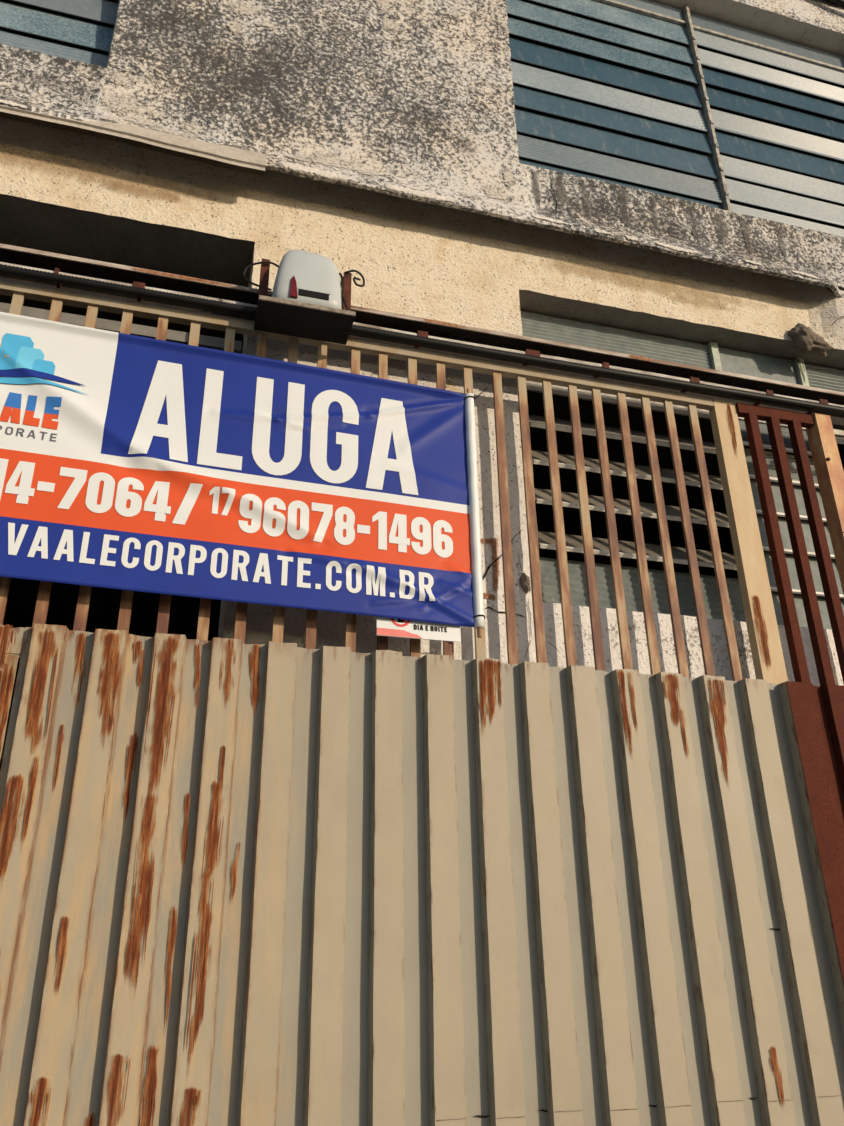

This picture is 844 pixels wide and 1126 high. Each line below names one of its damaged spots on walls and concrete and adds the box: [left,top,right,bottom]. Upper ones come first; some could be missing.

damp [278,161,357,182]
damp [382,184,461,203]
damp [532,171,573,226]
damp [581,181,611,234]
damp [620,190,638,240]
damp [654,209,698,253]
corrosion [0,625,65,881]
corrosion [663,674,689,757]
corrosion [708,679,729,786]
corrosion [98,632,179,993]
corrosion [186,745,240,1071]
corrosion [140,1045,159,1126]